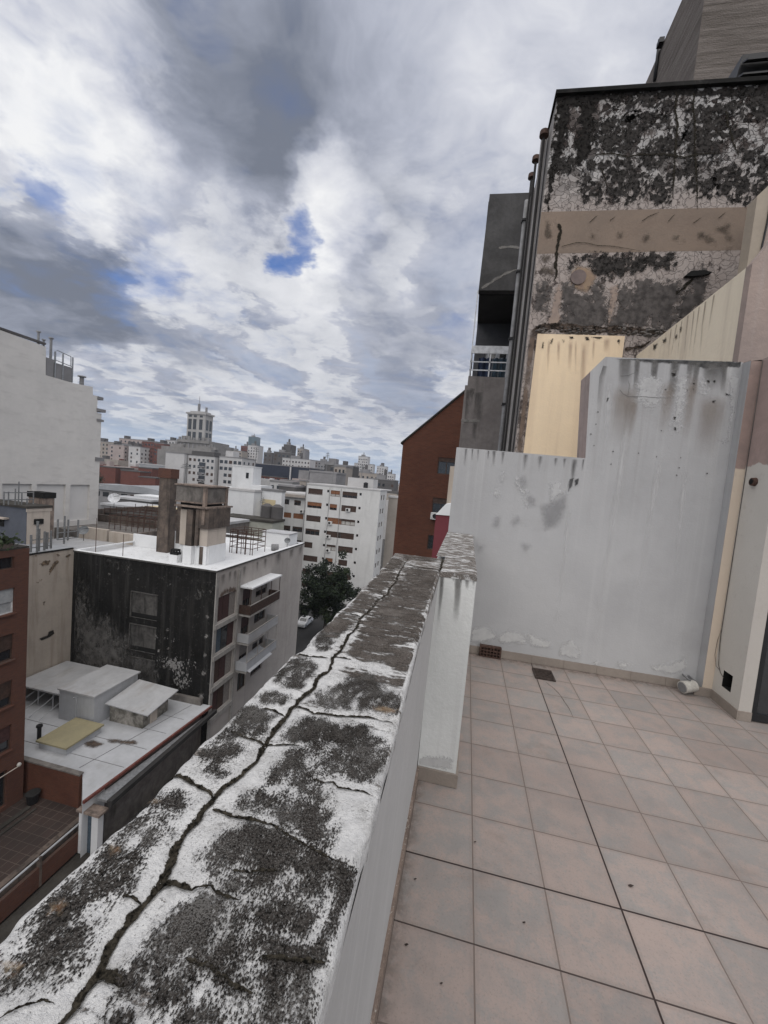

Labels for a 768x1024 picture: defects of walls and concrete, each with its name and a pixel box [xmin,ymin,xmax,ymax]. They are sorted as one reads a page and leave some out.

crack [553,216,638,281]
flaking render [533,263,712,351]
damp [517,331,539,451]
damp [621,358,741,379]
damp [546,478,579,524]
damp [84,739,136,748]
crack [0,557,443,1024]